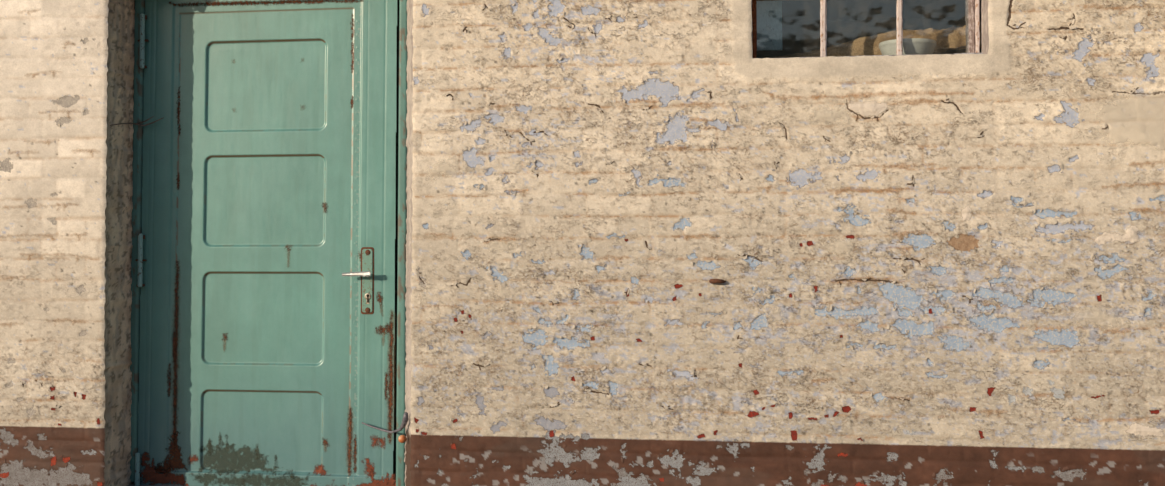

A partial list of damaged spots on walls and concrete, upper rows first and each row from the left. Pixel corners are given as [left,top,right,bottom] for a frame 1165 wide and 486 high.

rust [169,0,363,73]
crack [1006,0,1083,40]
peeling [616,70,739,147]
crack [846,103,888,121]
crack [774,123,787,169]
spalling [900,221,1003,253]
peeling [814,262,1078,352]
rust [140,262,198,486]
rust [310,292,396,486]
peeling [0,427,103,486]
peeling [805,444,907,486]
peeling [988,450,1087,486]